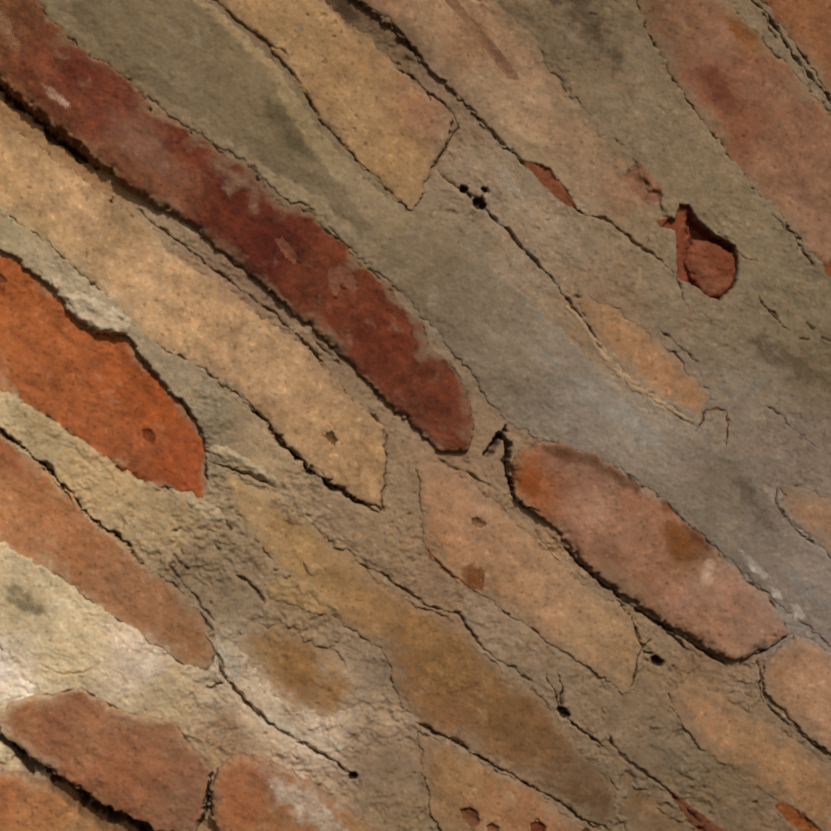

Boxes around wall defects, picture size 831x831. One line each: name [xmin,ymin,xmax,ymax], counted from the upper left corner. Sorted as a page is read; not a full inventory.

spalling [522,161,580,211]
spalling [530,819,546,831]